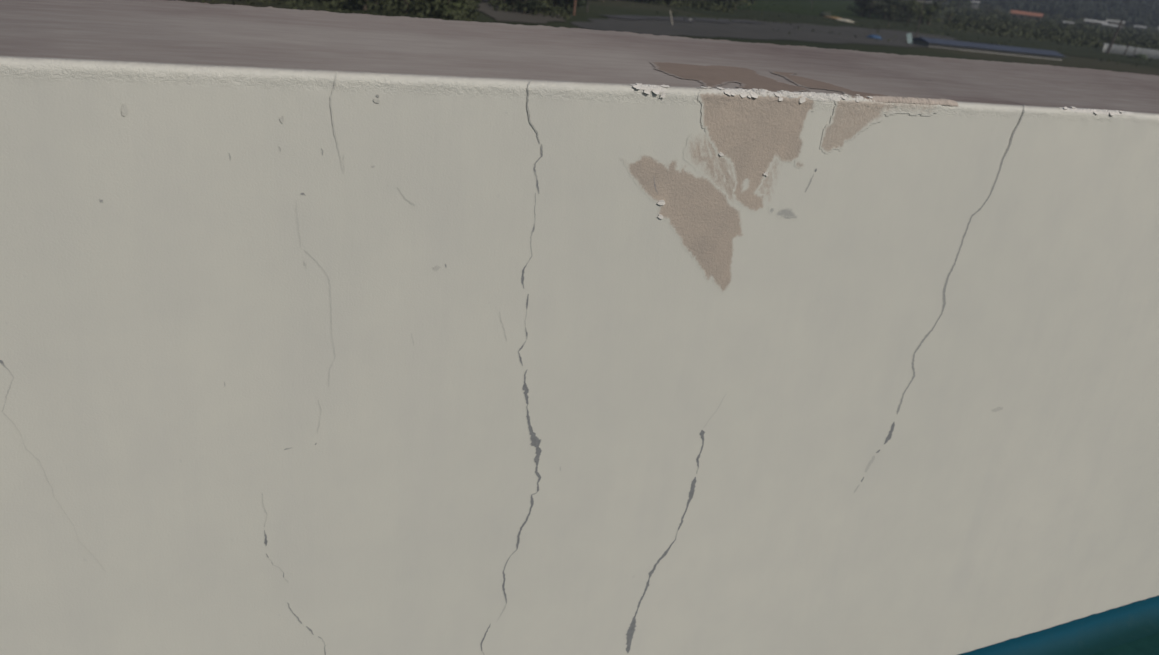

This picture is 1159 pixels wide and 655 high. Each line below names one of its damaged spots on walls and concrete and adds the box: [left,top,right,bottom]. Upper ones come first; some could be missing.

crack [480,79,543,655]
crack [625,394,726,653]
peeling [620,61,941,293]
crack [853,98,1025,493]